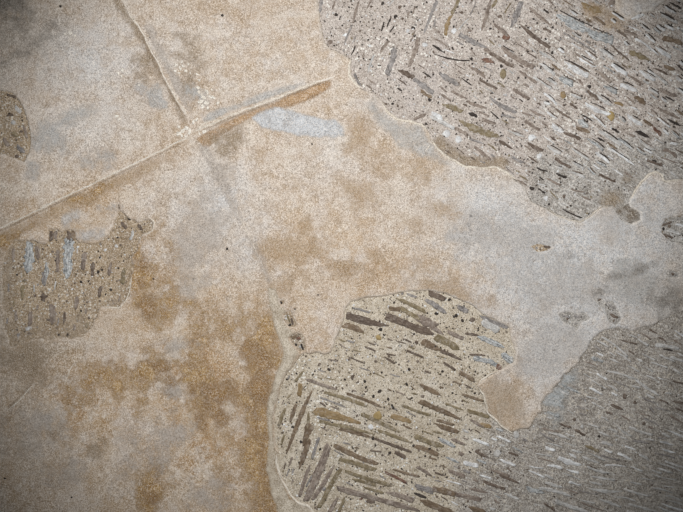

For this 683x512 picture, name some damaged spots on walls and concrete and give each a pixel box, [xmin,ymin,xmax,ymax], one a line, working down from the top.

spalling [0,91,31,161]
crack [0,10,336,229]
spalling [317,0,683,223]
spalling [2,212,155,346]
spalling [266,289,683,512]